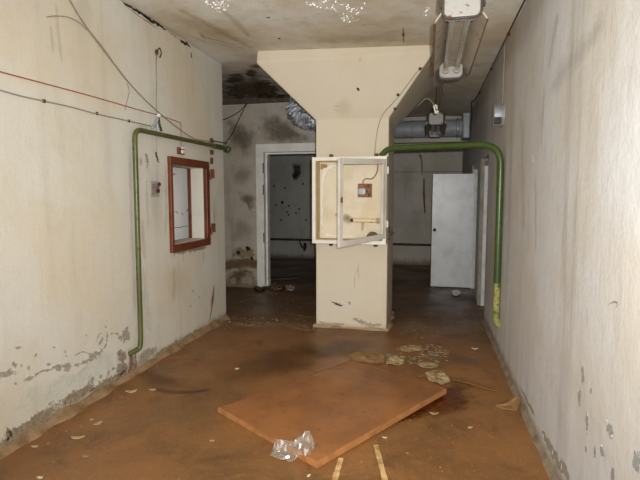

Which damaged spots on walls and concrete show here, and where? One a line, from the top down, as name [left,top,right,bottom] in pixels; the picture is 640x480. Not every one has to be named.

water stain [222,65,285,99]
water stain [225,258,257,286]
spalling [0,320,131,446]